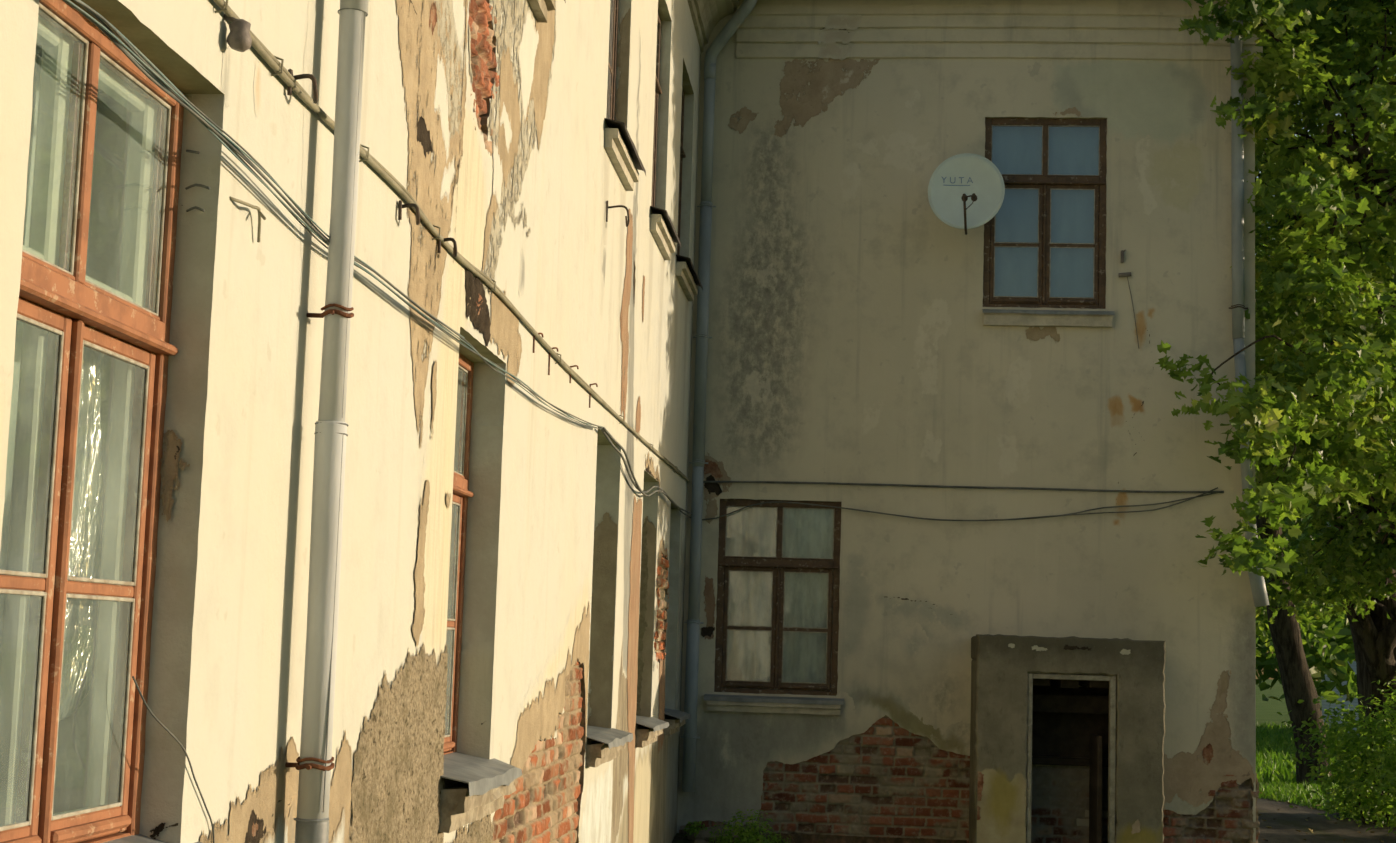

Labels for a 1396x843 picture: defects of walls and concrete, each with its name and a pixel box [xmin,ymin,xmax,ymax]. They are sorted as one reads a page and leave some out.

flaking render [774,58,880,137]
flaking render [396,0,556,447]
flaking render [620,209,645,434]
flaking render [645,452,660,493]
damp [579,28,862,843]
flaking render [492,495,670,843]
flaking render [150,823,166,839]
flaking render [200,737,299,843]
flaking render [328,729,352,843]
flaking render [680,715,1026,843]
flaking render [1163,670,1260,843]